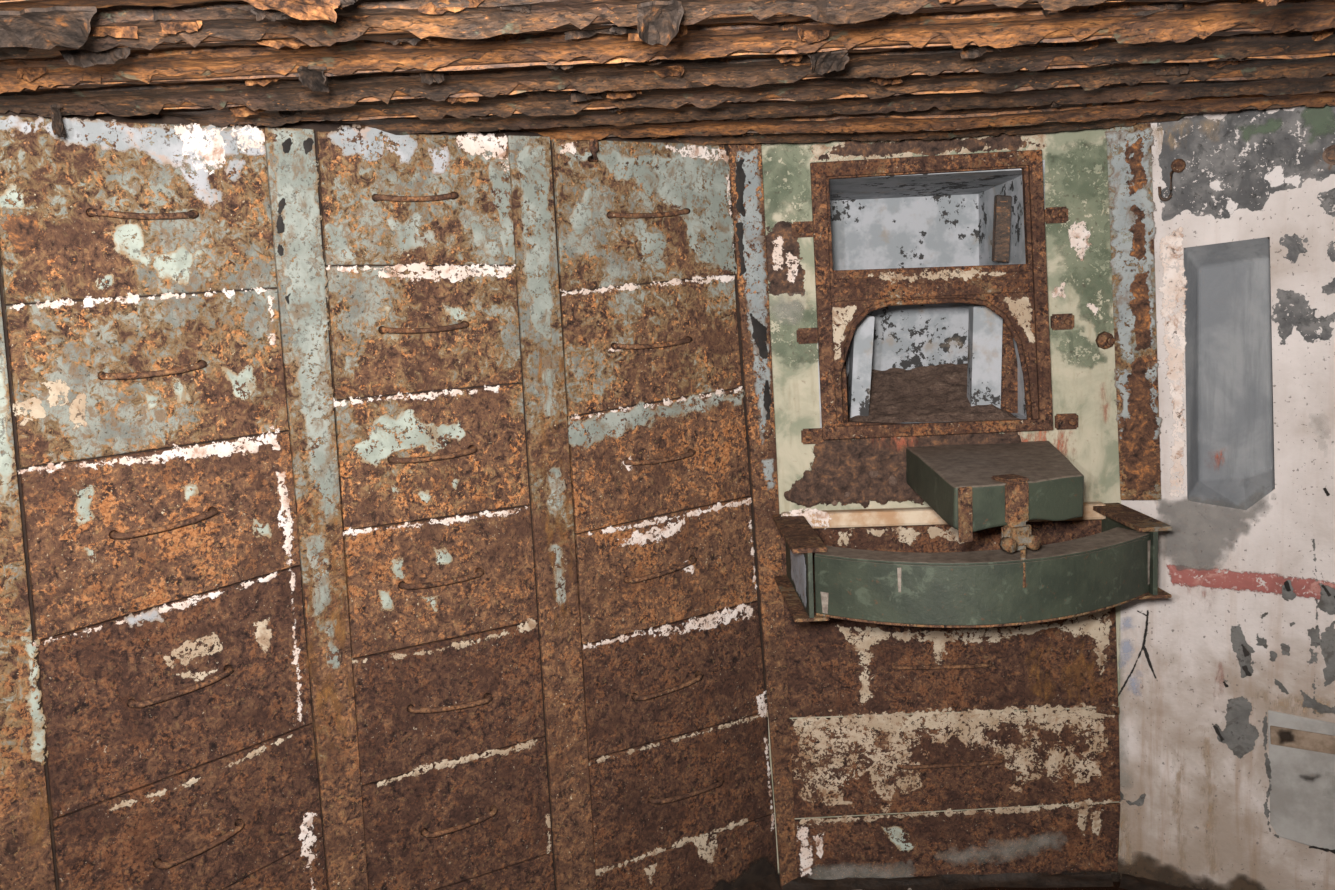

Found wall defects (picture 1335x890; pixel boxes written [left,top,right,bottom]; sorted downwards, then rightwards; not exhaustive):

rust [0,0,1335,495]
peeling [1045,105,1335,440]
peeling [1004,297,1035,343]
peeling [0,115,857,769]
spalling [1282,574,1296,601]
spalling [1223,612,1290,682]
spalling [1290,583,1335,687]
peeling [790,550,1116,877]
spalling [1212,696,1259,759]
spalling [1275,679,1335,714]
peeling [764,738,774,831]